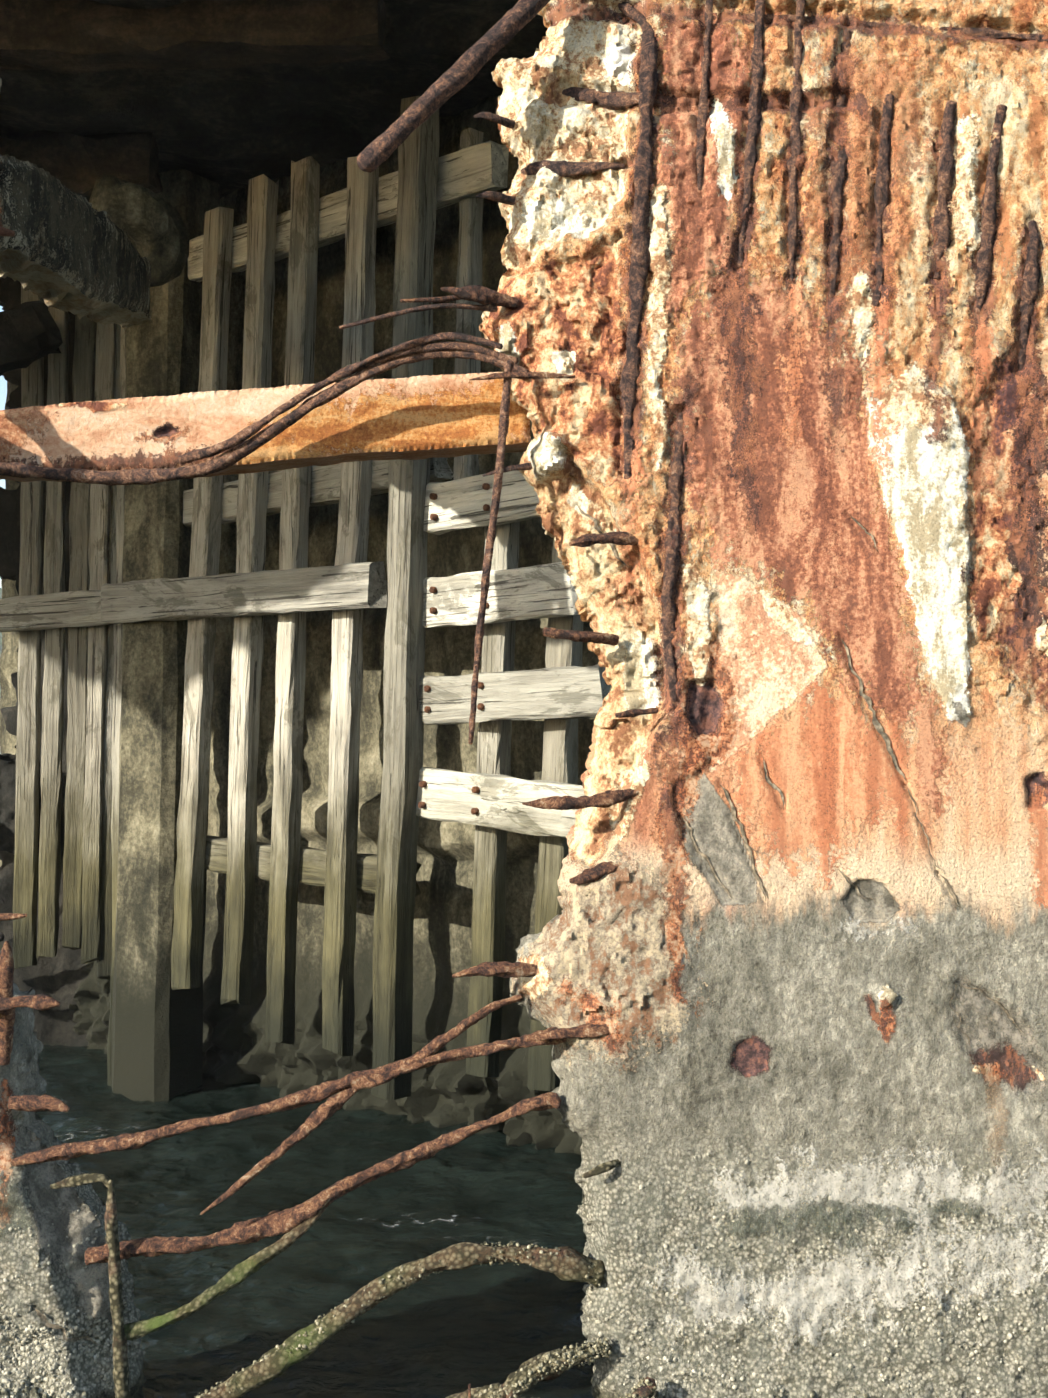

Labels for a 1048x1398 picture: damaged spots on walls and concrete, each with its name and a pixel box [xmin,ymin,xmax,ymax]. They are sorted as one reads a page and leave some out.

rust [0,372,530,471]
spalling [480,0,827,906]
rust [544,0,1048,1007]
crack [838,638,960,907]
rust [0,1079,18,1230]
spalling [21,1131,127,1324]